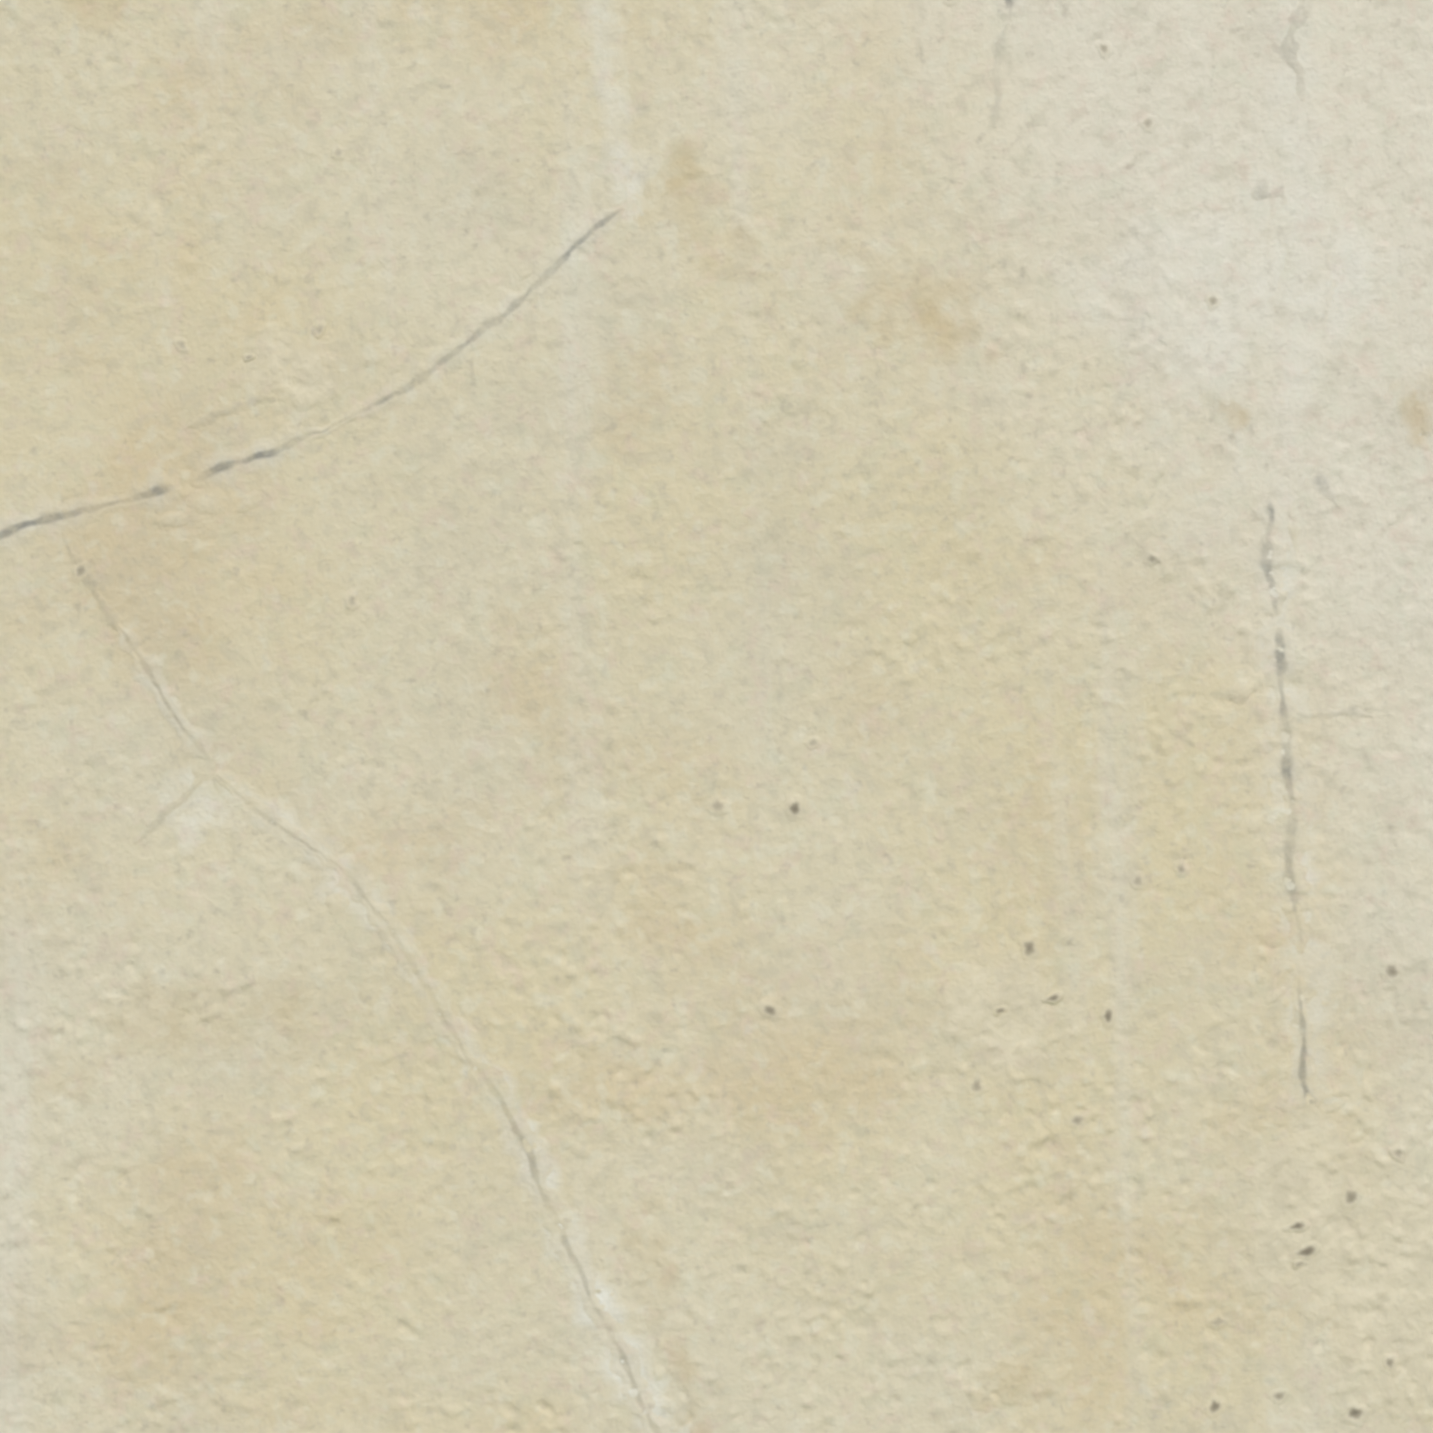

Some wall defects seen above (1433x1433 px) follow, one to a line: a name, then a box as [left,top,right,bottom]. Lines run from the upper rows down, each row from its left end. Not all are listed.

crack [987,0,1031,129]
crack [1208,465,1375,1179]